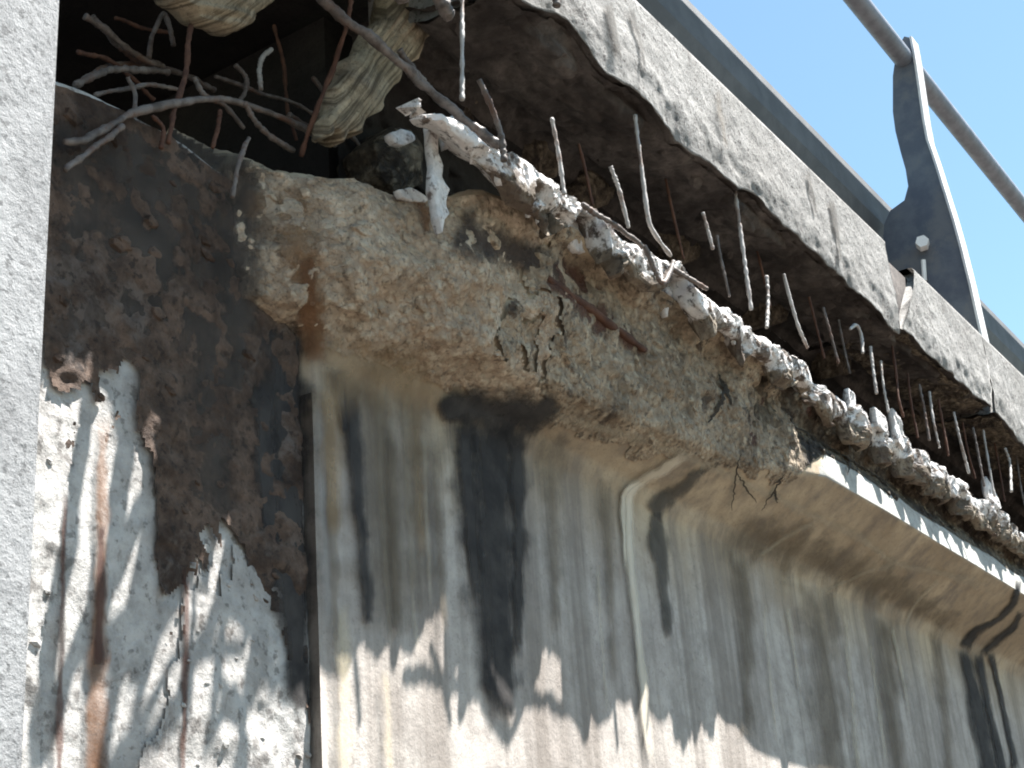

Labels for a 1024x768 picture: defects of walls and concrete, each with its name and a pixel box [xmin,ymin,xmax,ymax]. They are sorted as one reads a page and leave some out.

peeling [21,400,80,768]
corrosion [88,454,108,768]
spalling [42,11,313,768]
corrosion [181,579,190,768]
water stain [333,370,374,622]
water stain [439,389,560,718]
corrosion [546,253,643,353]
spalling [244,0,1024,576]
water stain [649,467,704,634]
crack [708,374,732,422]
crack [731,455,785,511]
water stain [960,582,1023,768]